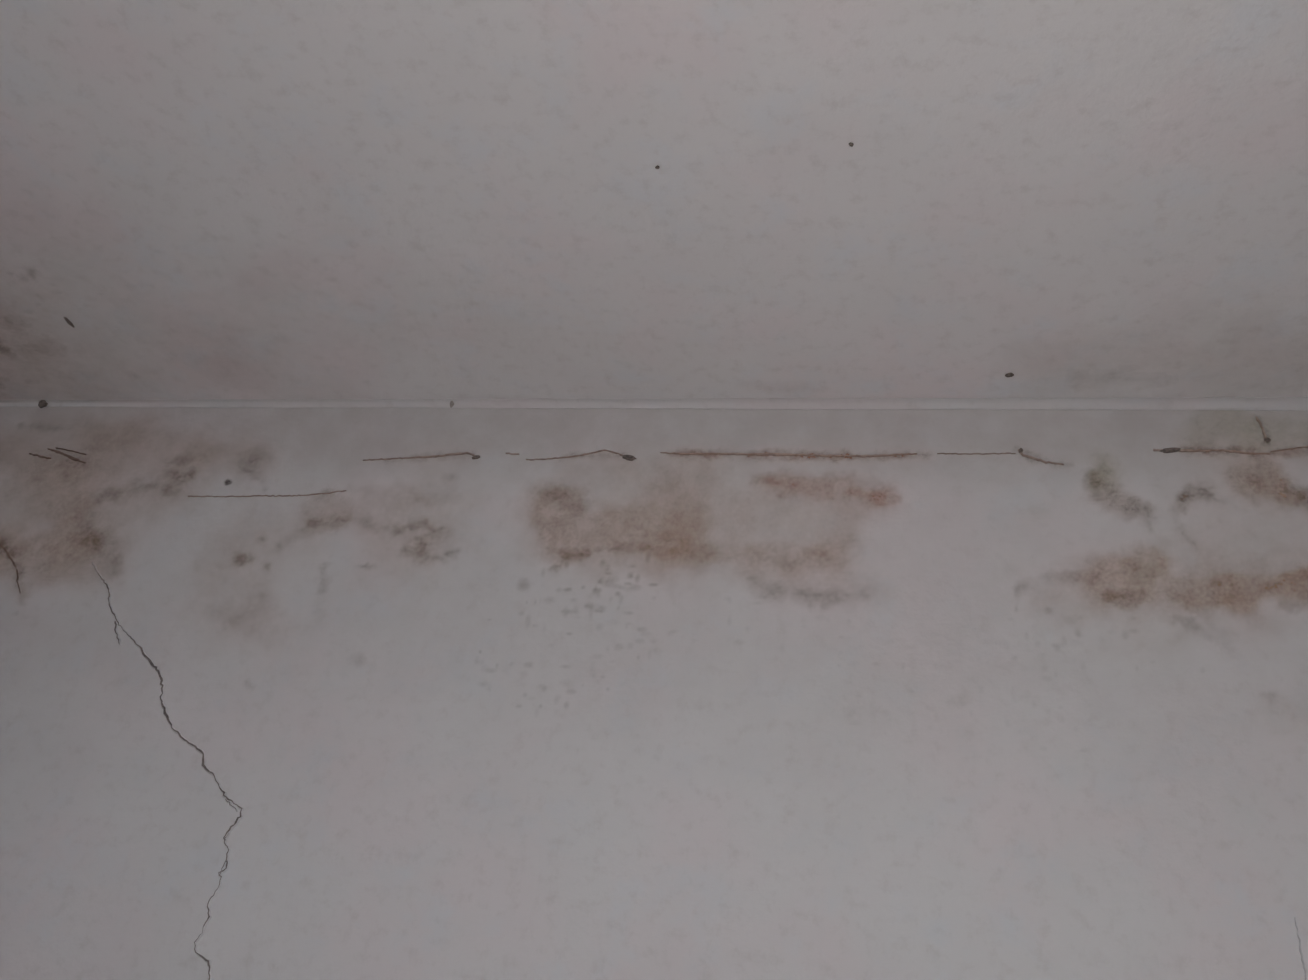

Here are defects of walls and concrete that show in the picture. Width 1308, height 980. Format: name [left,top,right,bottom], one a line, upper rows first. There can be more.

crack [1153,416,1308,455]
crack [363,452,475,461]
crack [506,449,622,461]
crack [660,449,1064,465]
crack [188,489,346,497]
crack [91,562,244,980]